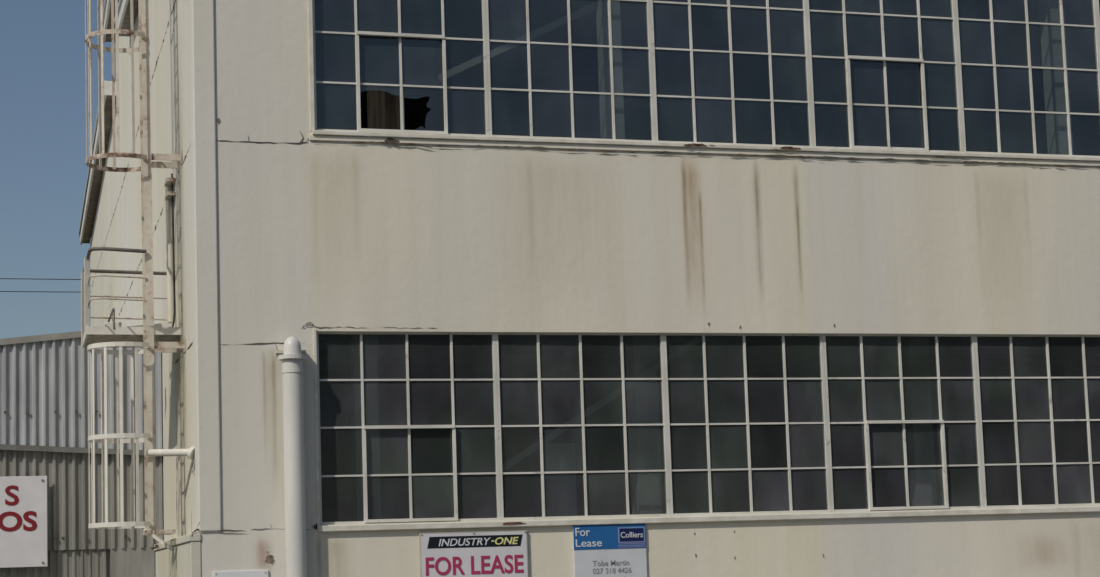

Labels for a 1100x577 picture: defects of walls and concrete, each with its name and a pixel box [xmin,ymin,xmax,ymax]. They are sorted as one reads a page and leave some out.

crack [216,132,1088,167]